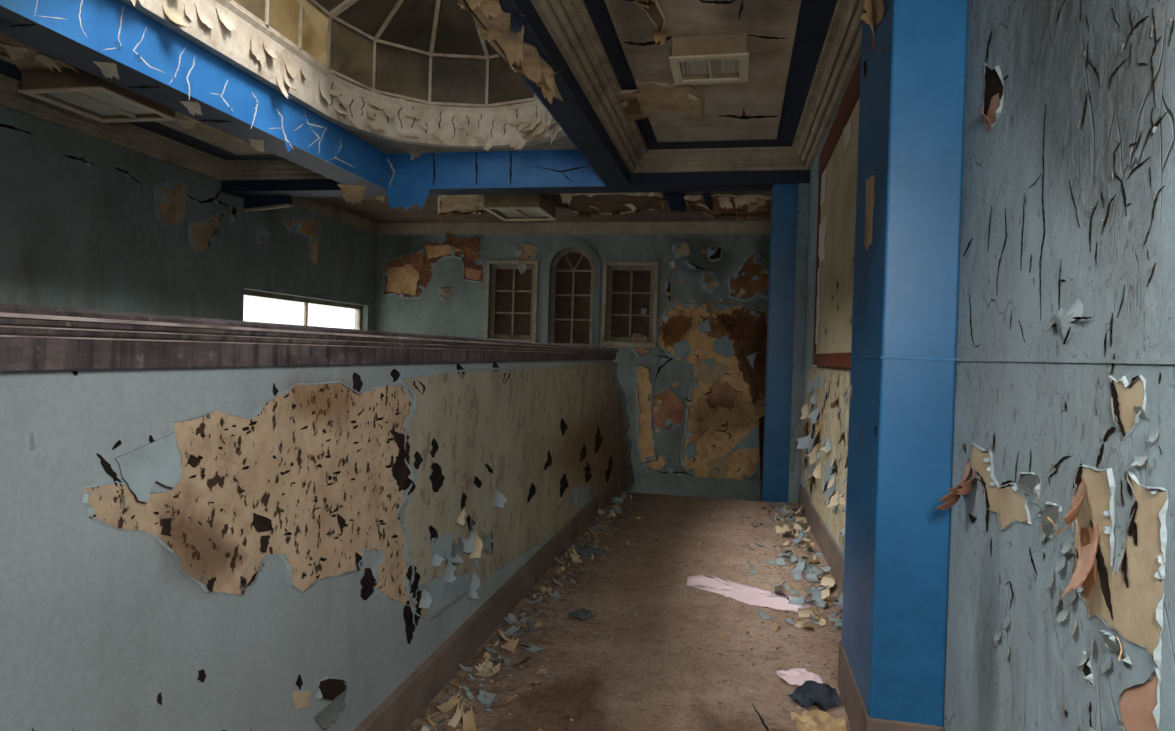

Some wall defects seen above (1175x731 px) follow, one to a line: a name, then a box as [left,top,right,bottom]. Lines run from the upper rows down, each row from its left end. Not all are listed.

crack [64,155,140,183]
peeling [93,61,119,80]
crack [10,0,355,168]
peeling [162,0,235,32]
peeling [251,0,566,152]
peeling [337,184,485,303]
peeling [616,81,705,120]
peeling [975,31,1009,131]
crack [963,0,1174,374]
peeling [78,240,769,644]
peeling [797,366,877,549]
peeling [936,375,1169,731]